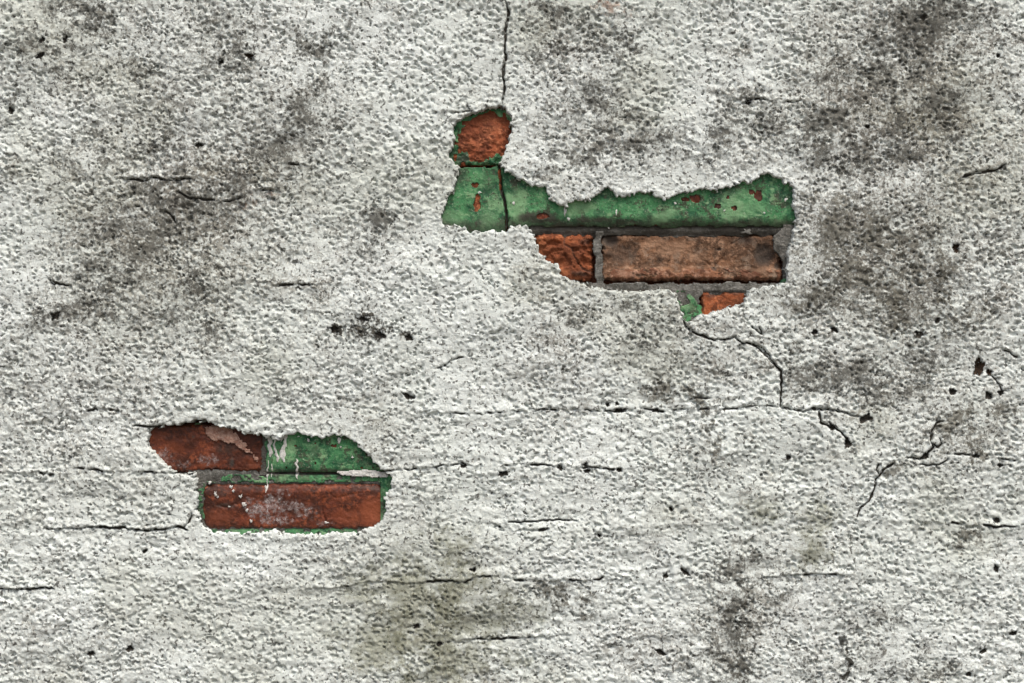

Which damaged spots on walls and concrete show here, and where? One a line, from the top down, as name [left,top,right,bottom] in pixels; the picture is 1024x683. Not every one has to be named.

crack [501,0,510,110]
spalling [441,107,796,322]
crack [46,515,192,532]
spalling [149,422,392,535]
crack [857,421,970,517]